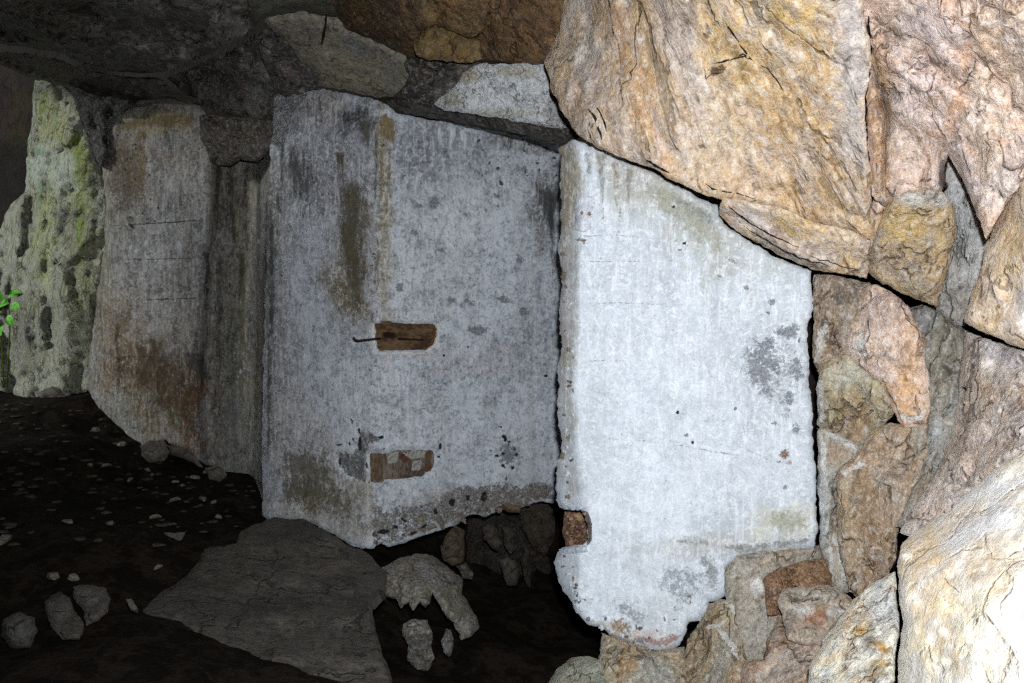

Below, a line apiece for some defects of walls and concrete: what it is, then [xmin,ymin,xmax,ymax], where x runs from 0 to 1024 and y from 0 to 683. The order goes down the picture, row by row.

peeling [415,196,440,210]
leakage [337,153,366,308]
peeling [497,296,530,316]
peeling [468,325,487,336]
spalling [372,347,704,643]